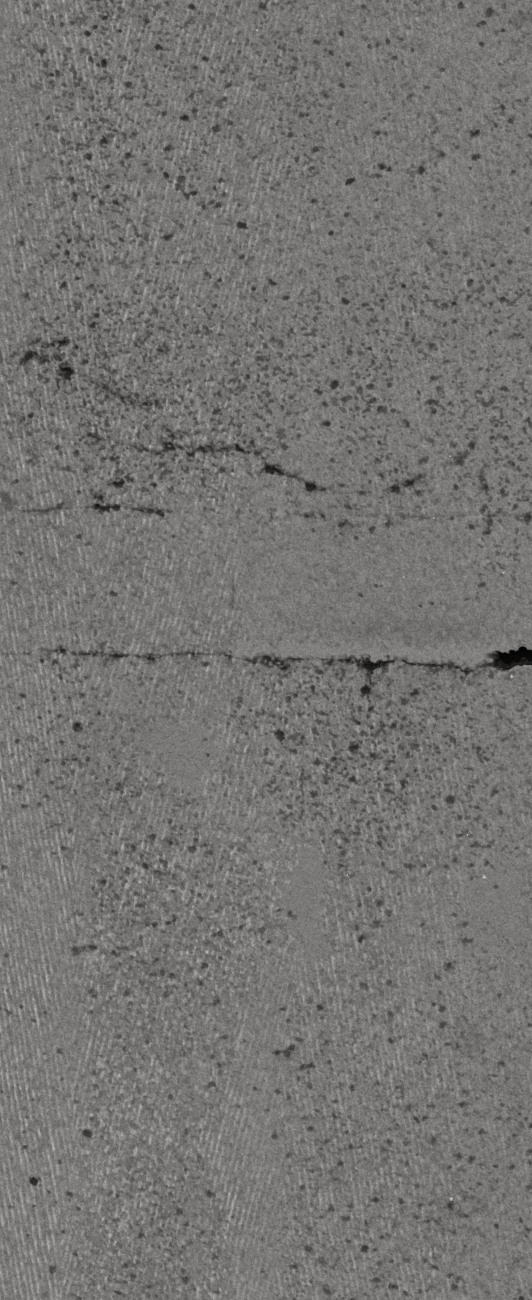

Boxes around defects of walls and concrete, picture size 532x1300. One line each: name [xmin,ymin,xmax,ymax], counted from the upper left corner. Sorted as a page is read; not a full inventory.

crack [55,646,502,685]
spalling [489,647,532,670]